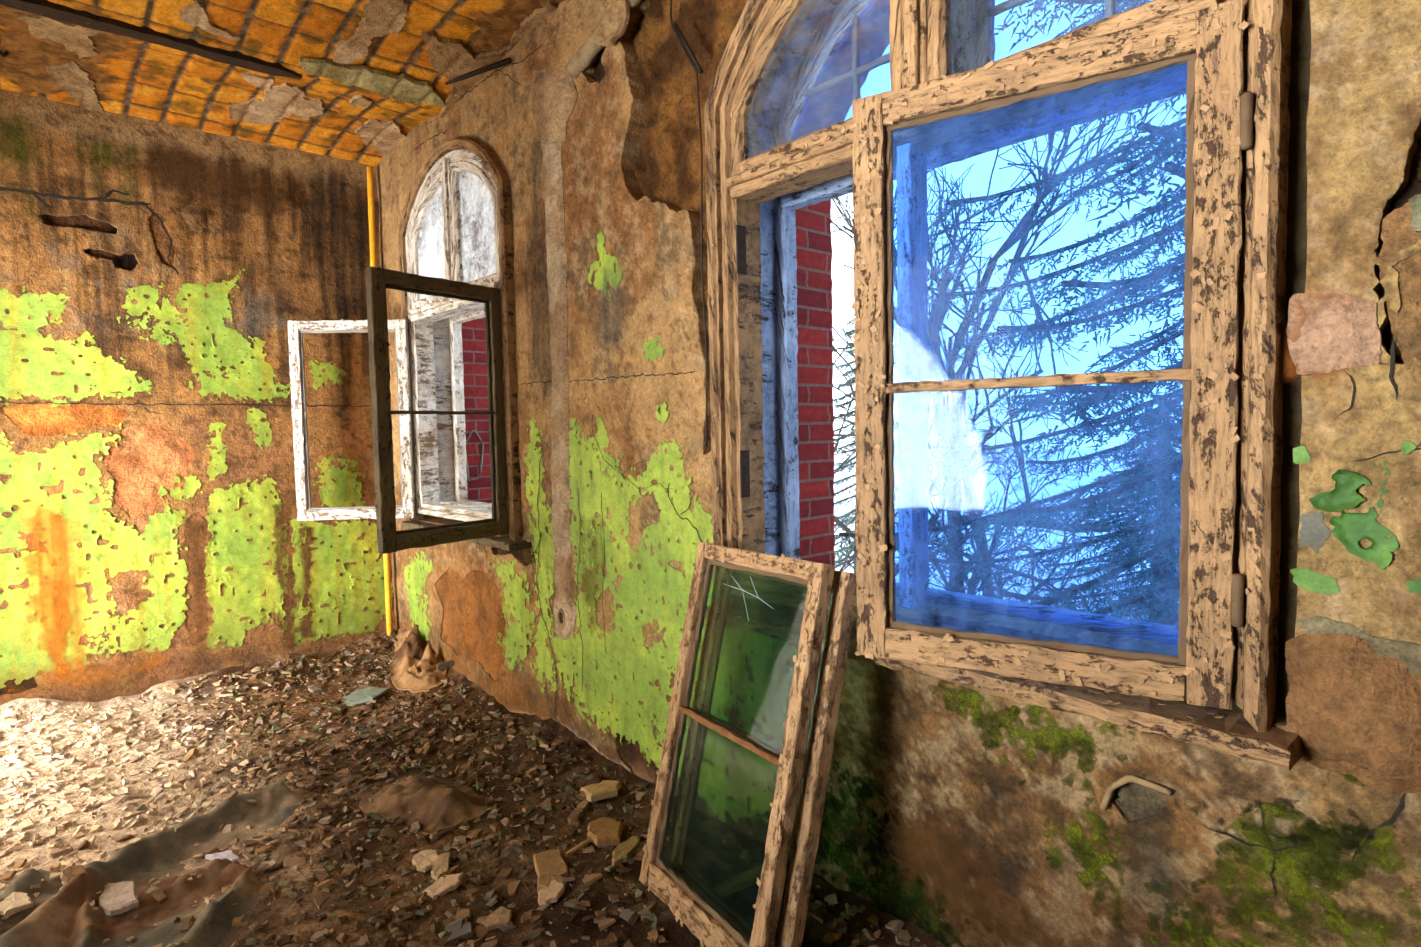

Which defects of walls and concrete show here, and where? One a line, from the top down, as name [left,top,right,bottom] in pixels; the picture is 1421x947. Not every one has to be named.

crack [0,187,179,276]
water stain [147,148,365,320]
peeling [0,0,822,830]
peeling [1293,446,1311,464]
peeling [1400,441,1417,455]
peeling [1299,461,1399,570]
peeling [1290,568,1340,594]
peeling [1406,578,1421,594]
peeling [645,870,717,947]